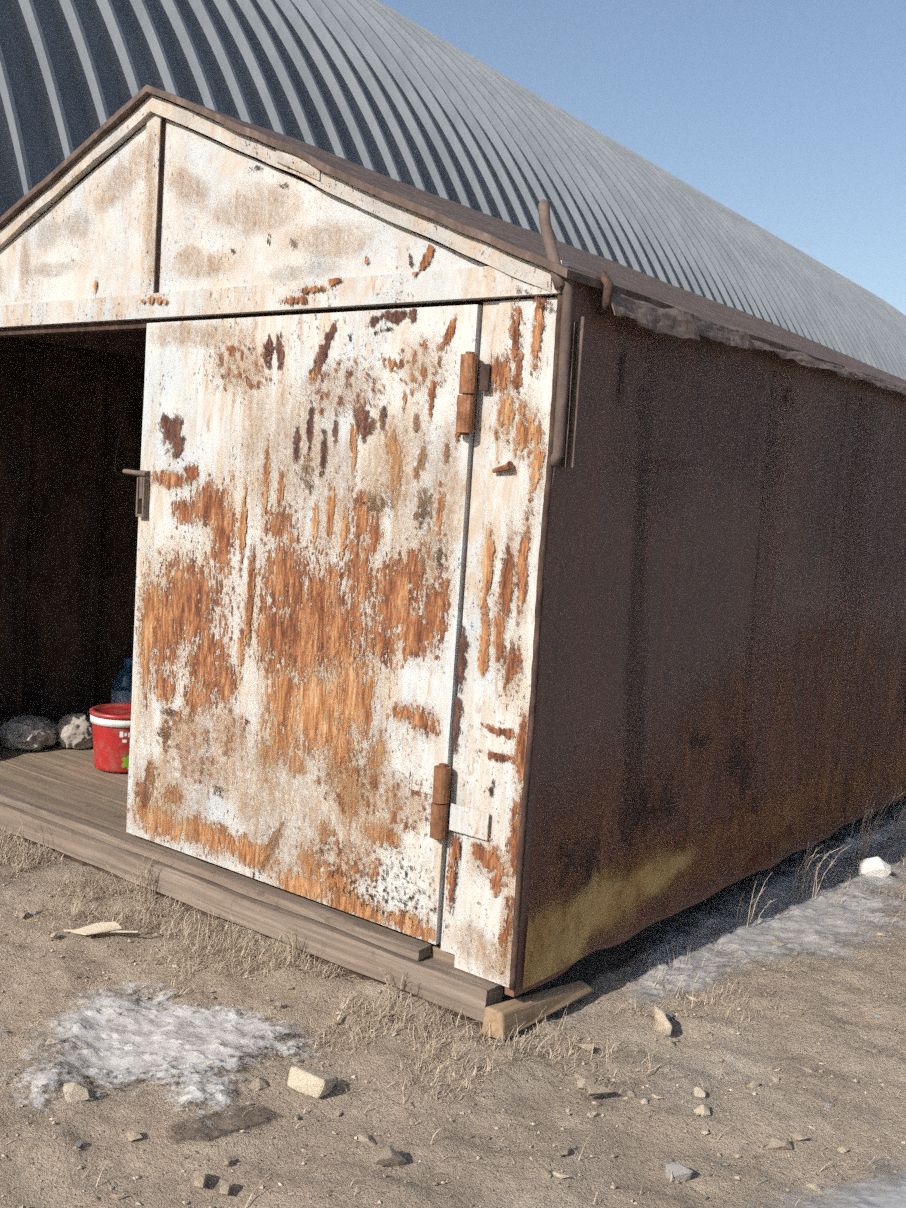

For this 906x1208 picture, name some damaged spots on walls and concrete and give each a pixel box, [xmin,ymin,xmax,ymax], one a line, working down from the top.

rust [412,244,435,277]
rust [278,277,342,306]
rust [127,285,553,974]